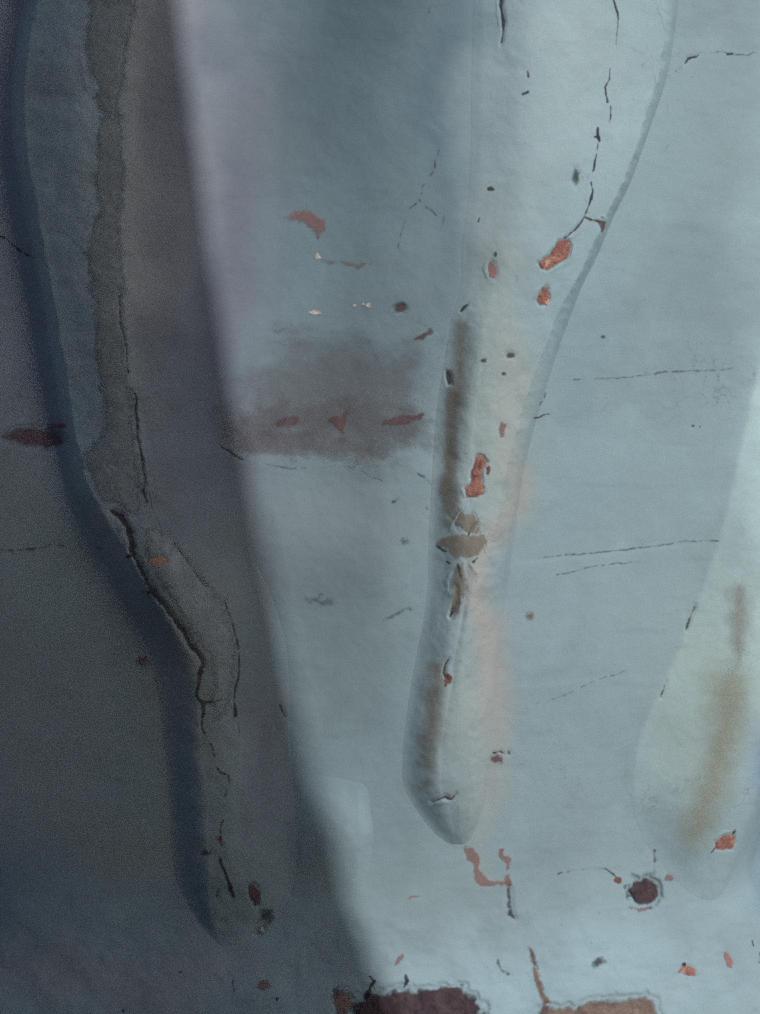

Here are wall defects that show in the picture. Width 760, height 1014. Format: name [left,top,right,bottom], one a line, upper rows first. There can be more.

crack [495,0,505,43]
crack [564,74,612,239]
spalling [290,211,325,238]
spalling [537,239,575,270]
spalling [0,419,66,447]
damp [382,413,424,426]
spalling [444,455,490,553]
crack [97,295,240,899]
spalling [711,829,736,853]
spalling [333,974,486,1014]
spalling [541,998,657,1014]